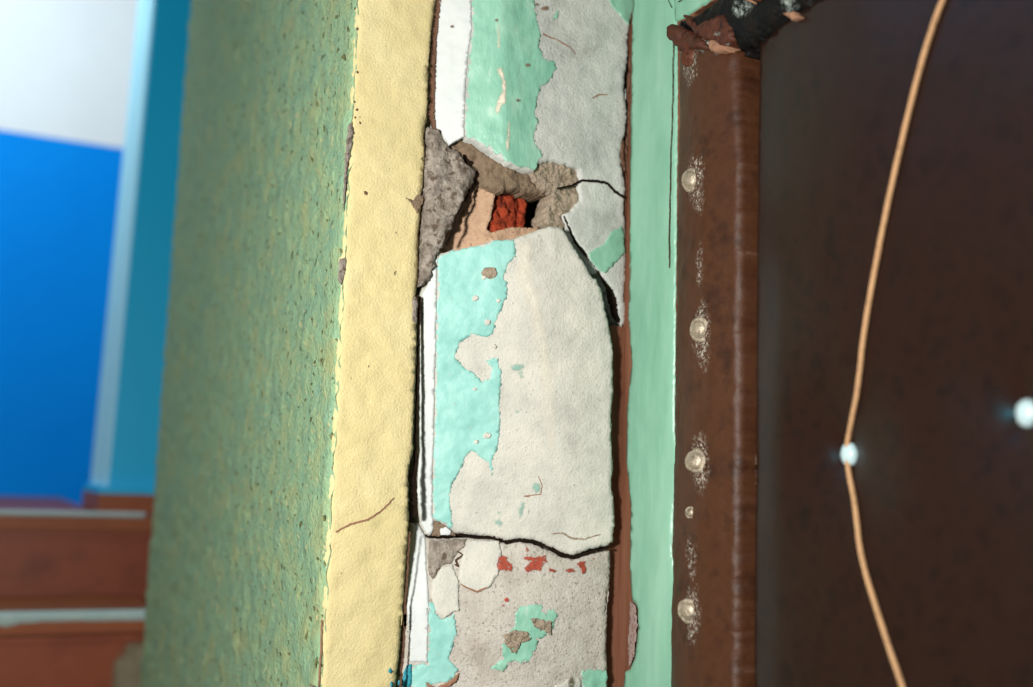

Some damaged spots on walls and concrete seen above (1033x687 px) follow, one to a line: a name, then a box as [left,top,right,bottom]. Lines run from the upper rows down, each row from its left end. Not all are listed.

crack [427,0,441,133]
peeling [609,0,633,26]
crack [556,55,630,224]
crack [563,216,620,323]
peeling [589,226,626,273]
peeling [406,0,579,687]
crack [336,296,609,687]
flaking render [524,548,594,574]
peeling [555,669,608,687]